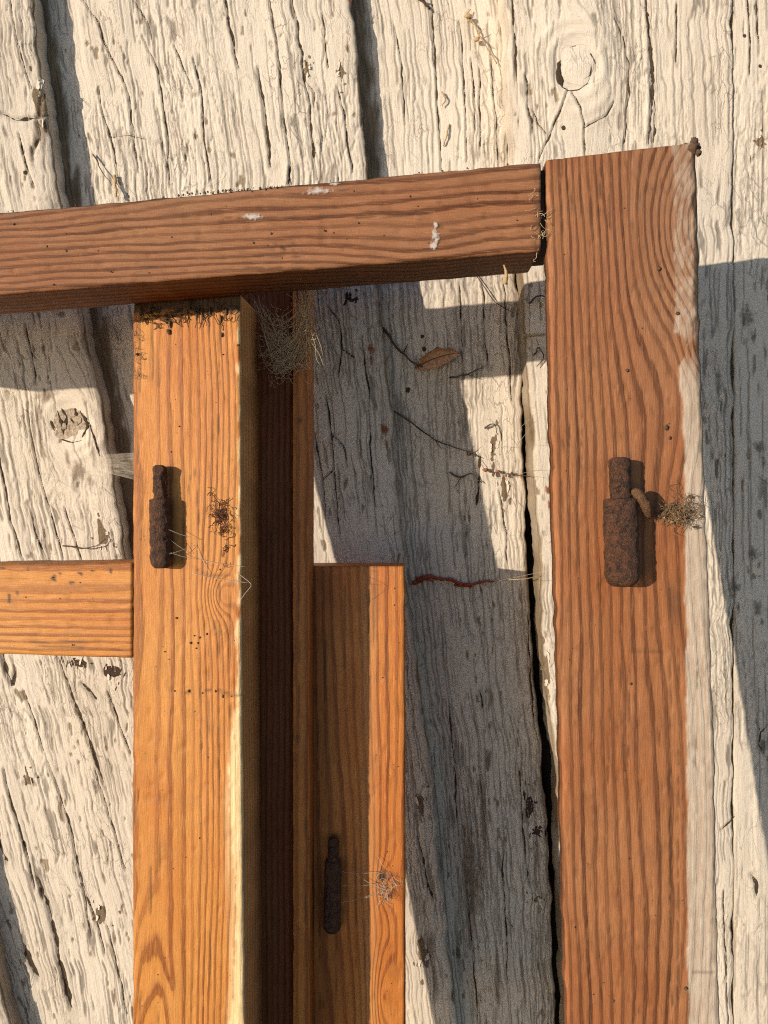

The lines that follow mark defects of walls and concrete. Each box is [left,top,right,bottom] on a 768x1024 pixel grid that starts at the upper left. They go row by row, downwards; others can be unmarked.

crack [526,617,534,718]
crack [501,768,529,980]